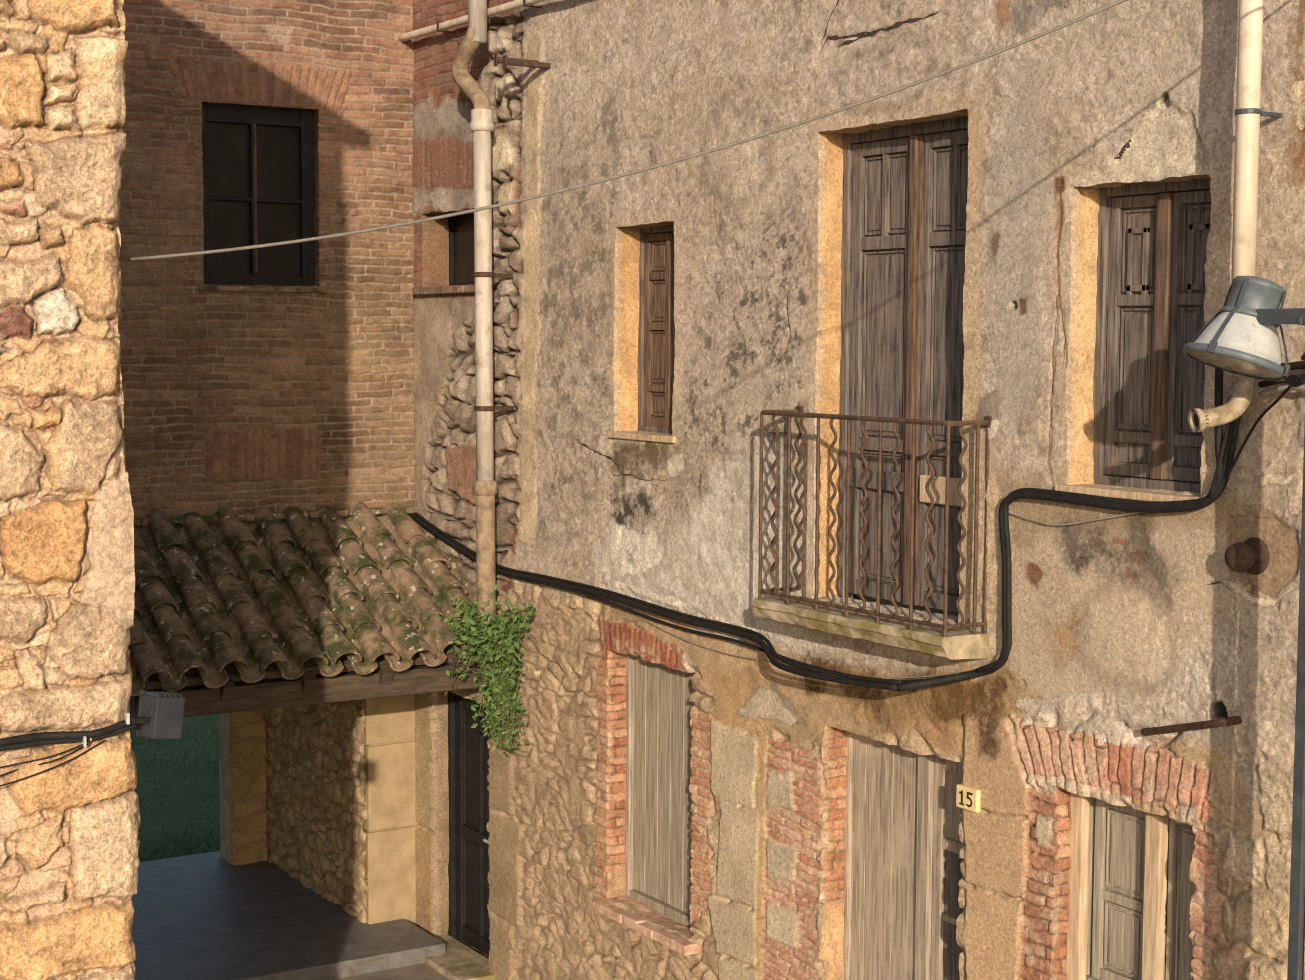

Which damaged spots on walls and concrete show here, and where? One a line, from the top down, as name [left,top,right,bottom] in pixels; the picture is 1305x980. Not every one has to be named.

crack [818,0,942,54]
spalling [1288,77,1305,131]
spalling [1204,209,1233,325]
spalling [1204,364,1232,410]
crack [577,441,687,481]
spalling [1200,424,1226,497]